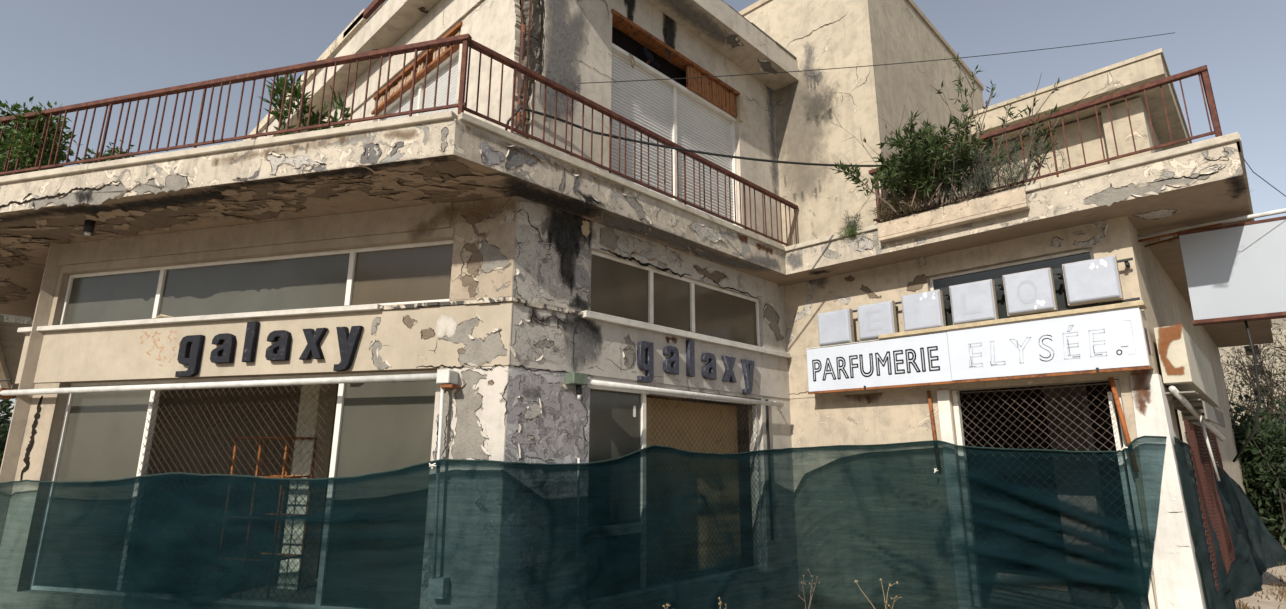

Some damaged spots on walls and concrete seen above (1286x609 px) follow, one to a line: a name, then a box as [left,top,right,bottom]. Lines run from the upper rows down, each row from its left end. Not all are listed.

leakage [541,0,584,120]
leakage [624,0,635,28]
leakage [663,0,727,63]
leakage [805,48,821,88]
crack [0,181,121,208]
peeling [559,168,602,207]
peeling [1084,164,1226,220]
peeling [0,0,591,462]
peeling [581,192,729,283]
leakage [443,175,827,371]
peeling [623,335,637,369]
crack [20,396,43,480]